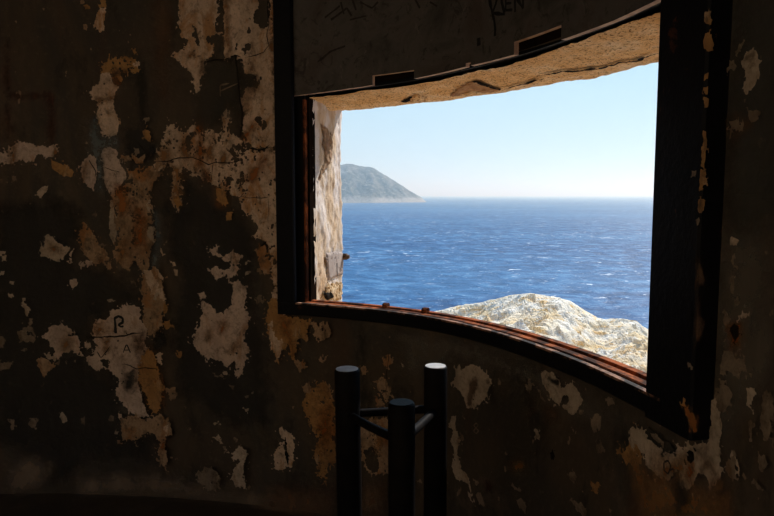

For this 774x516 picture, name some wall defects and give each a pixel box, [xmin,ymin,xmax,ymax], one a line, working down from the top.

crack [137,0,269,180]
peeling [703,10,716,52]
peeling [727,39,762,103]
peeling [691,130,709,226]
peeling [0,0,333,472]
peeling [195,421,249,492]
spalling [302,380,336,486]
peeling [451,364,492,410]
peeling [525,370,605,454]
rust [680,397,697,433]
peeling [616,338,774,516]